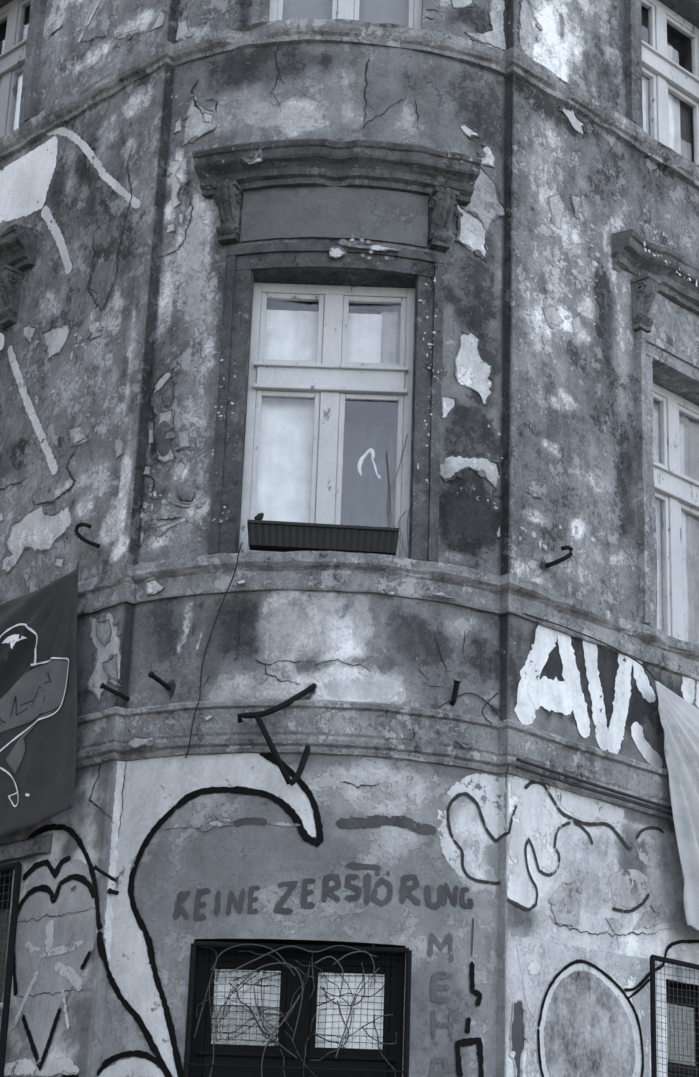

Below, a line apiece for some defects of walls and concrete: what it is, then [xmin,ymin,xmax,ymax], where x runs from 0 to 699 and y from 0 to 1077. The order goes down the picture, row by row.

peeling [451,0,543,59]
crack [270,44,285,112]
crack [362,56,419,129]
peeling [453,123,505,262]
water stain [603,217,624,315]
peeling [154,371,173,393]
peeling [424,328,495,446]
peeling [114,438,125,460]
peeling [143,409,191,480]
peeling [440,454,503,489]
peeling [0,504,72,573]
peeling [140,490,230,542]